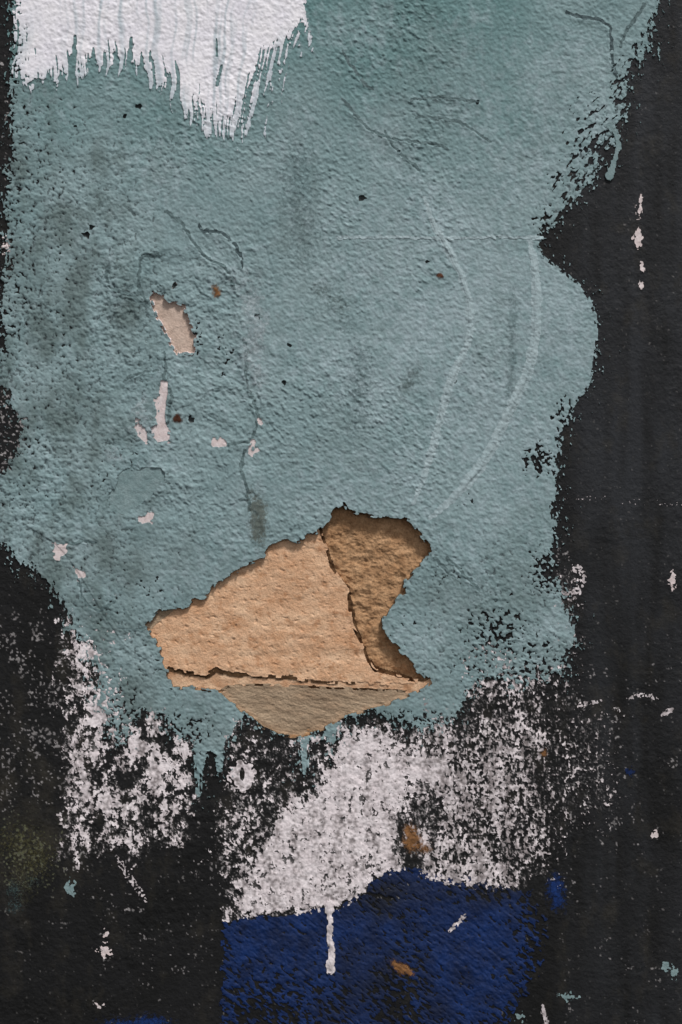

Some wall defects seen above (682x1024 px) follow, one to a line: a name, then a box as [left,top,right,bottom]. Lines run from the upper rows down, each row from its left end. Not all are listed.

peeling [134,380,171,444]
peeling [149,282,196,356]
peeling [48,608,201,878]
flaking render [145,502,625,922]